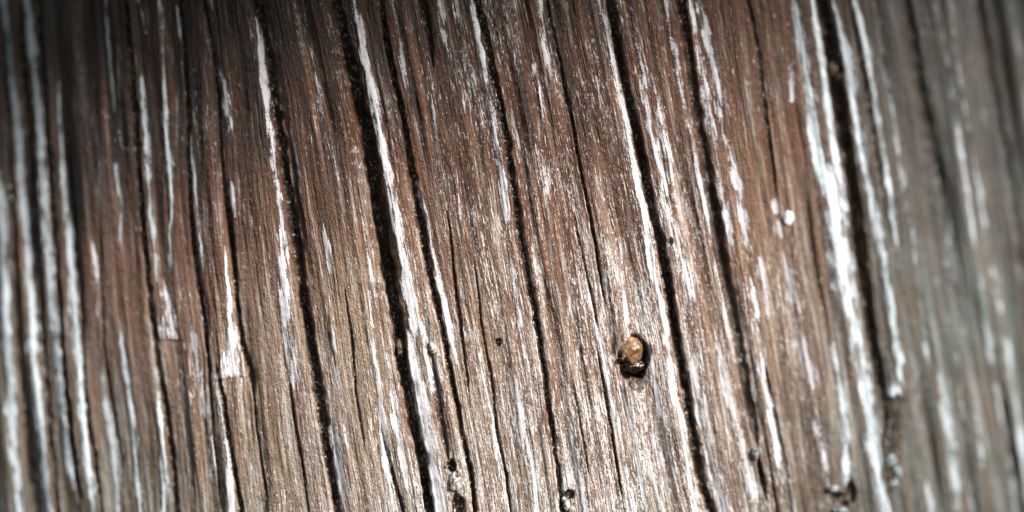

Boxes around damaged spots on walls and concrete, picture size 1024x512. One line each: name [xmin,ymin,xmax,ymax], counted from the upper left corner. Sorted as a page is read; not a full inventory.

crack [253,0,342,512]
crack [331,0,434,512]
crack [379,0,512,512]
spalling [562,490,575,512]
crack [605,0,715,512]
crack [816,0,891,437]
peeling [890,465,903,492]